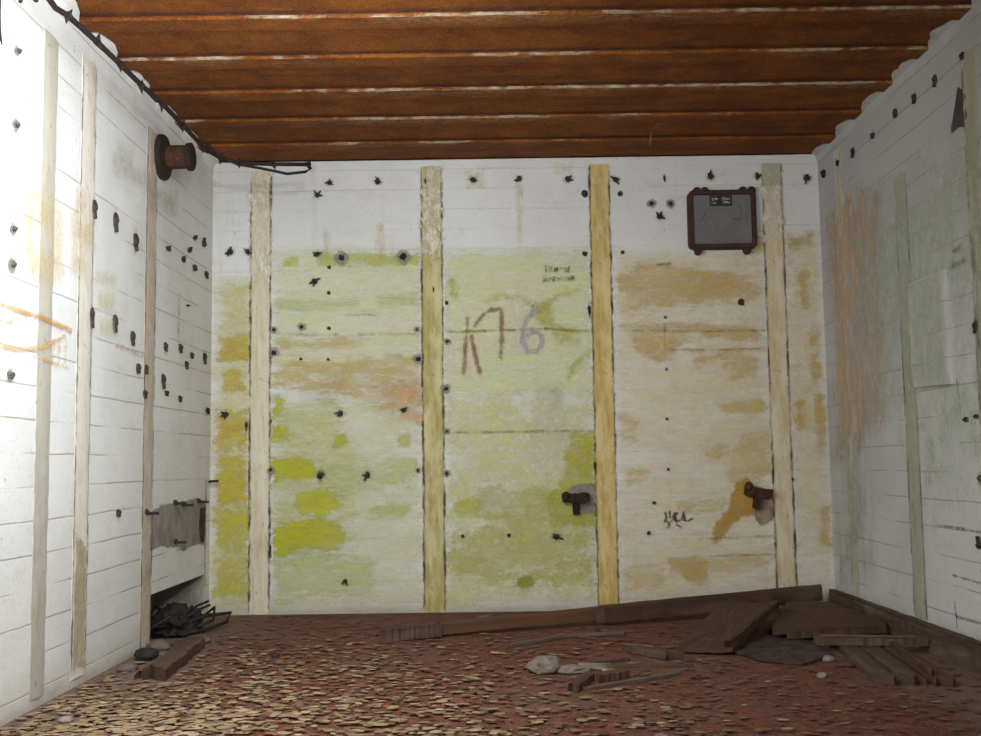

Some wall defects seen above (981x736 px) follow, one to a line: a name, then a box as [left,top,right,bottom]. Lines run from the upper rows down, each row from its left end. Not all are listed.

damp [273,355,420,400]
rust [713,479,763,542]